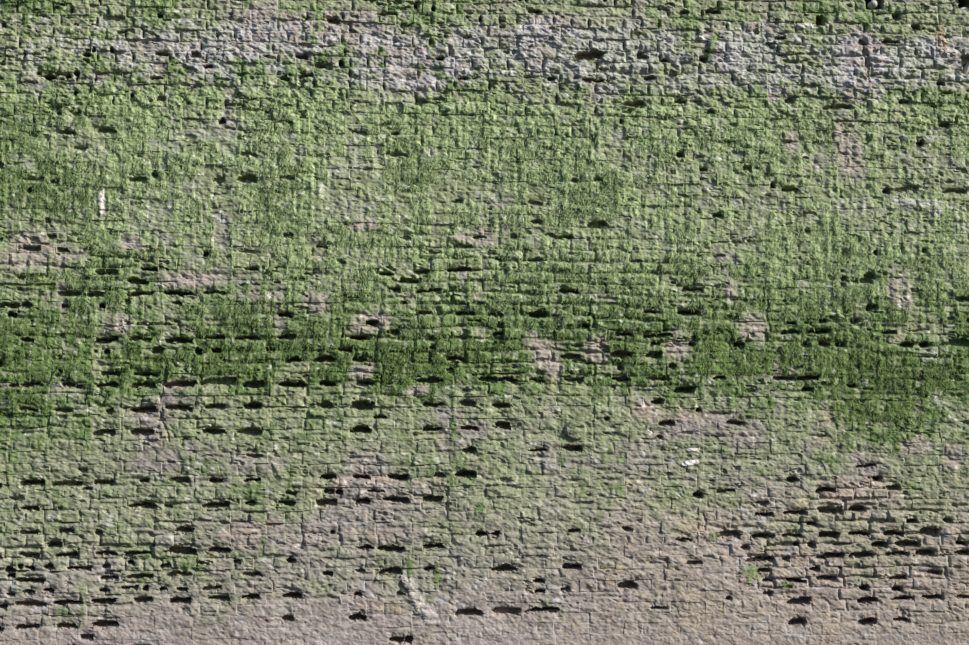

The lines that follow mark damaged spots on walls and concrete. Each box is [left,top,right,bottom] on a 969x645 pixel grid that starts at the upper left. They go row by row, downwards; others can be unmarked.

leakage [419,146,439,163]
leakage [97,184,107,217]
leakage [885,197,948,218]